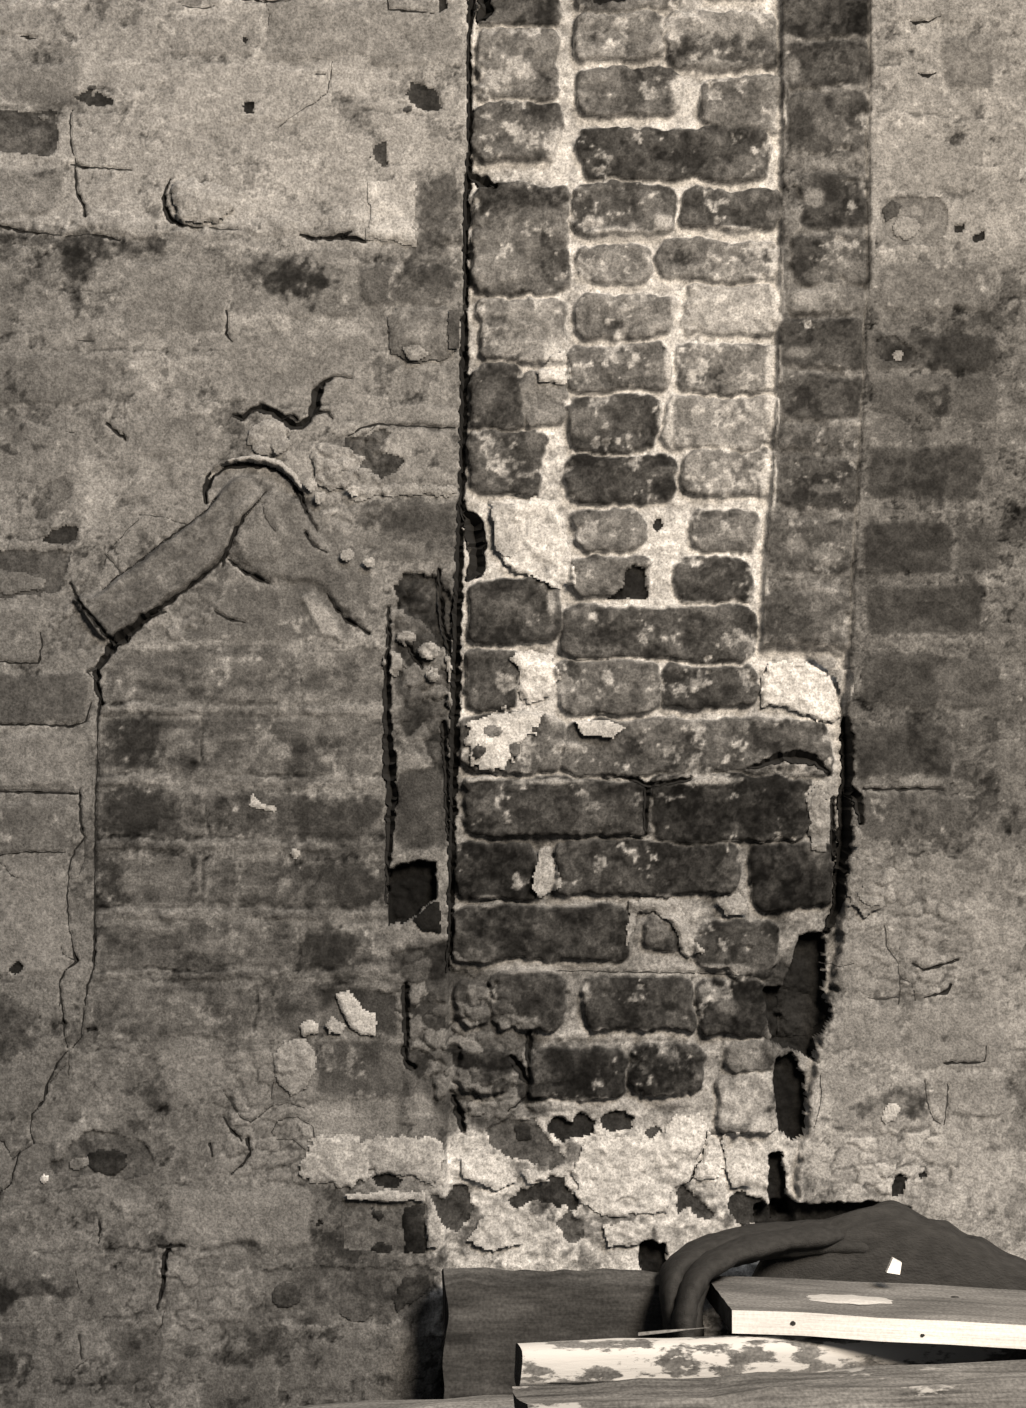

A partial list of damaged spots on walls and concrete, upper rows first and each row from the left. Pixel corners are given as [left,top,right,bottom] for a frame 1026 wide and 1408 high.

spalling [403,82,442,113]
crack [228,0,496,972]
spalling [382,573,464,710]
flaking render [574,720,626,739]
crack [0,462,327,1193]
flaking render [532,846,563,898]
crack [747,717,944,967]
flaking render [626,896,705,957]
crack [868,925,959,1004]
crack [401,984,415,1070]
crack [451,1096,466,1132]
flaking render [262,1110,767,1328]